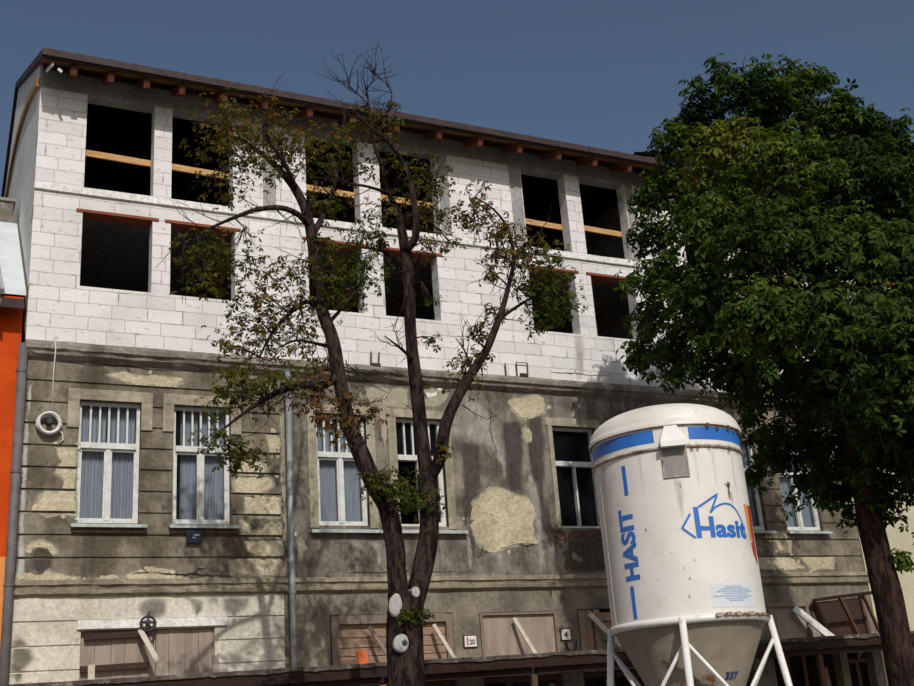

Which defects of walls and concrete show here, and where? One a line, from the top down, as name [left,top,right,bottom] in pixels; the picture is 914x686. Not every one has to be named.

peeling [107,371,184,388]
peeling [508,393,551,444]
peeling [228,413,307,578]
peeling [462,486,552,555]
peeling [21,539,60,557]
crack [132,568,230,577]